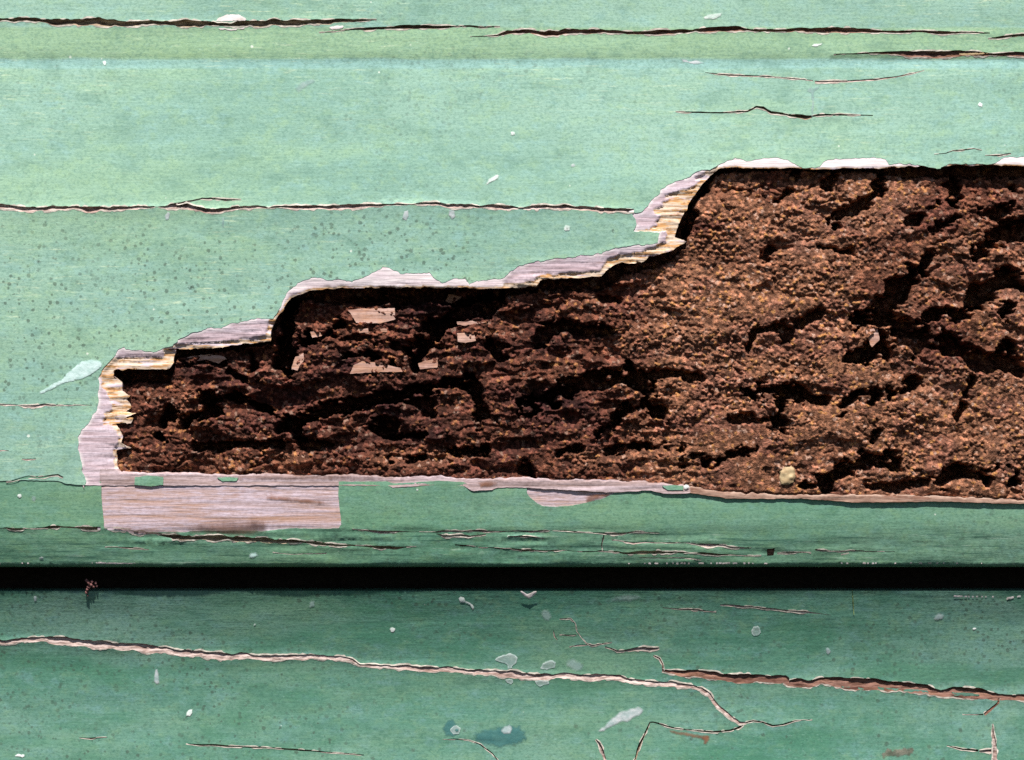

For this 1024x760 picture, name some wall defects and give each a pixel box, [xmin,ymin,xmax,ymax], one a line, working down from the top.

crack [0,16,1024,84]
crack [676,106,873,120]
crack [0,197,634,214]
peeling [78,157,1024,535]
crack [3,524,895,560]
crack [0,618,1024,760]